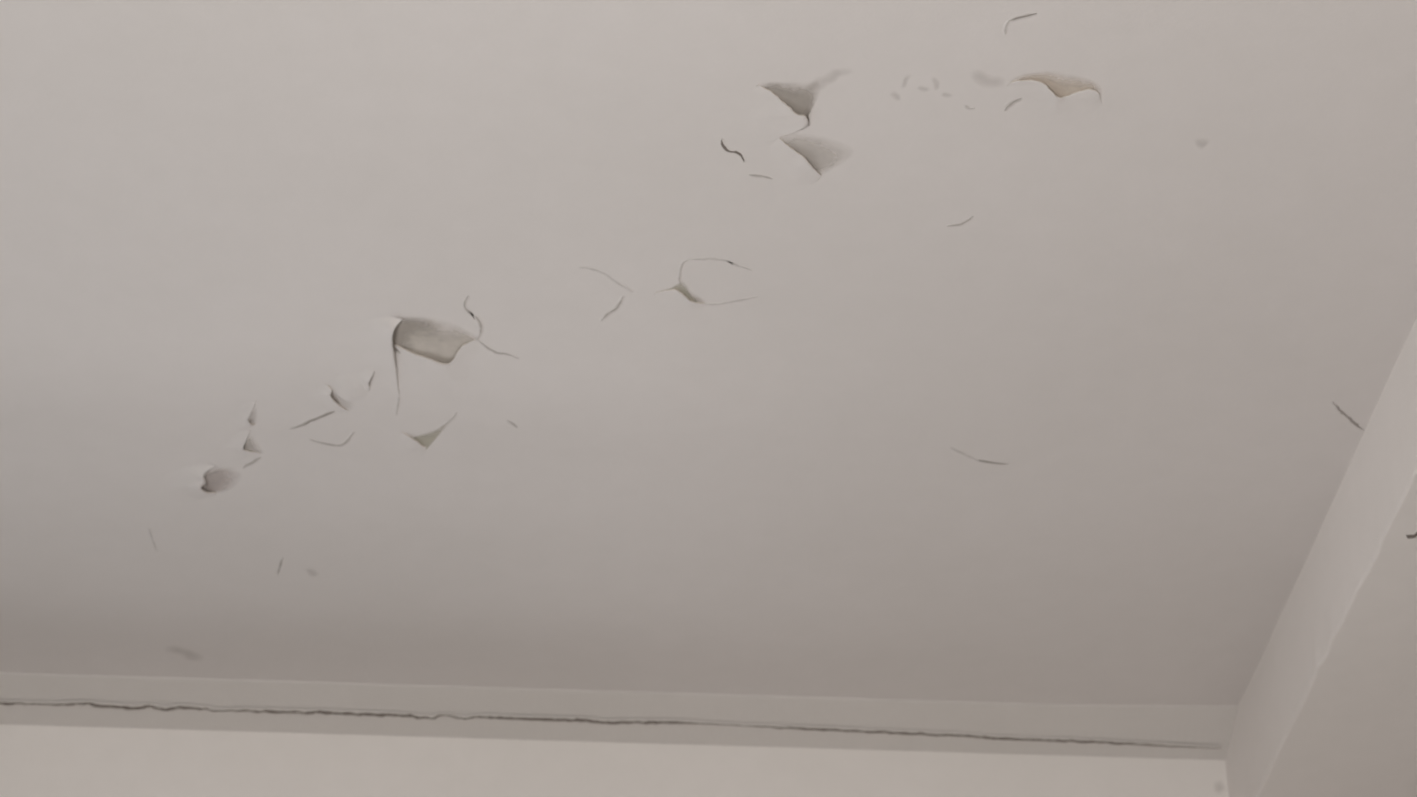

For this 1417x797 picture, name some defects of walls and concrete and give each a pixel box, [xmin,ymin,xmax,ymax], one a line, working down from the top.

peeling [351,295,520,458]